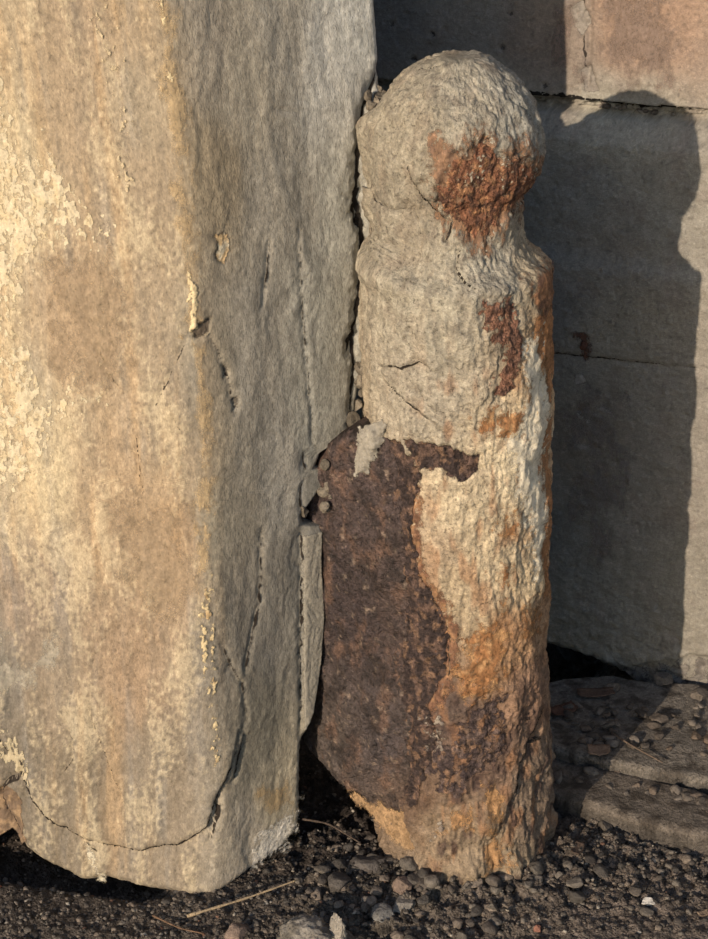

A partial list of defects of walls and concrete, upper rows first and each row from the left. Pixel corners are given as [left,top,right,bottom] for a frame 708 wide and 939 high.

spalling [214,232,229,264]
corrosion [421,124,545,258]
corrosion [478,257,554,438]
crack [298,454,306,510]
crack [0,543,262,852]
crack [297,533,305,720]
spalling [353,419,509,808]
corrosion [410,416,553,711]
spalling [620,657,708,701]
corrosion [350,791,415,850]
corrosion [481,784,518,876]